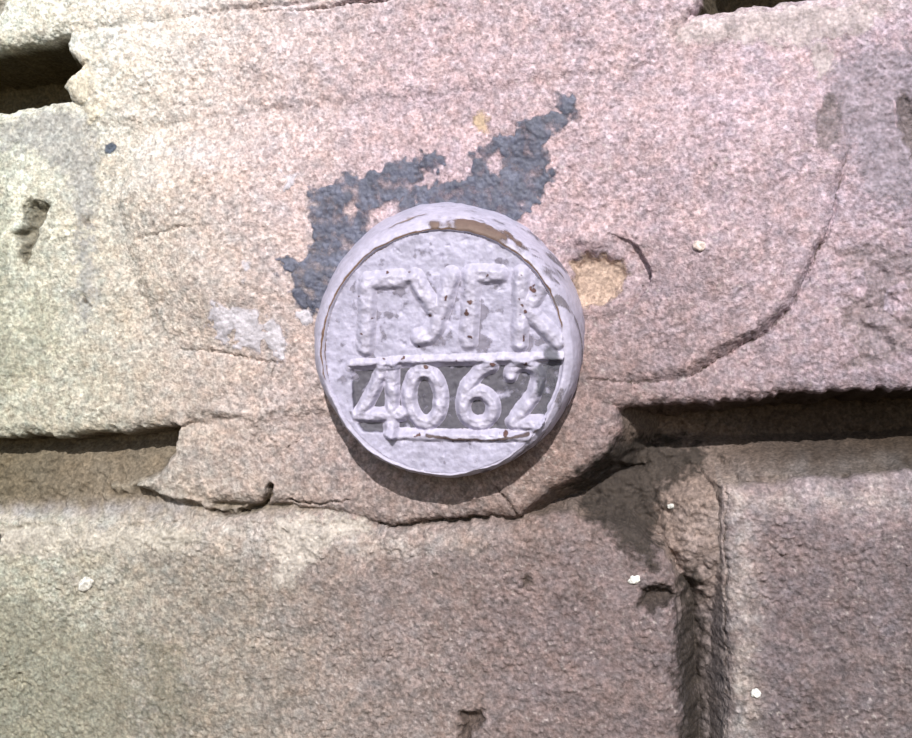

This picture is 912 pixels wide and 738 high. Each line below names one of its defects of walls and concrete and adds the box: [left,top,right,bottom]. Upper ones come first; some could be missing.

peeling [555,93,578,119]
peeling [418,150,446,175]
peeling [275,255,300,272]
peeling [292,290,316,325]
crack [215,484,310,515]